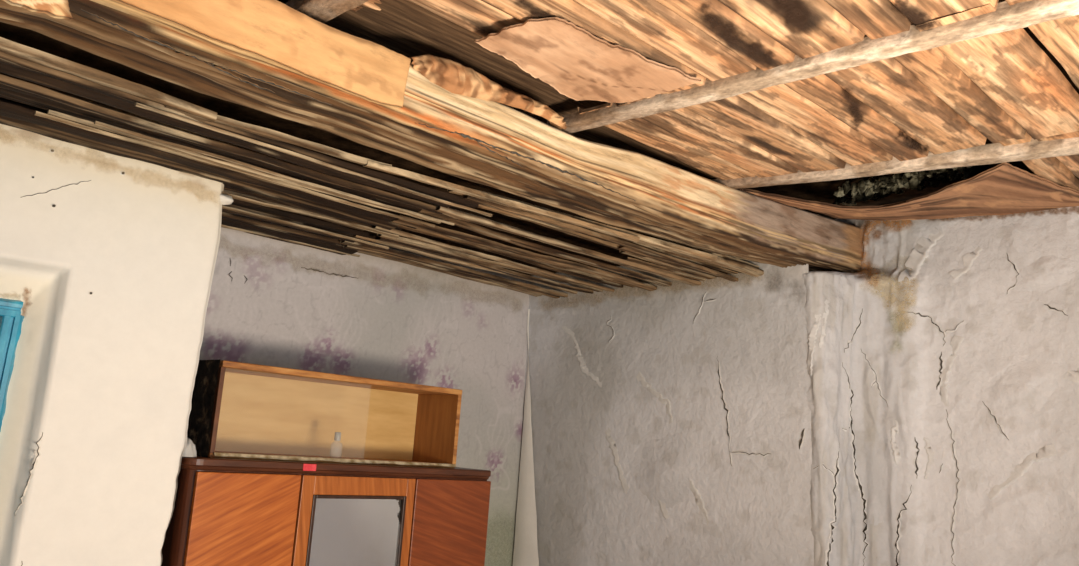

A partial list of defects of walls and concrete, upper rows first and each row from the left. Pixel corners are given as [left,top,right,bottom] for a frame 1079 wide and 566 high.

water stain [776,0,809,33]
crack [15,432,44,516]
crack [717,356,771,466]
crack [798,308,888,566]
crack [894,311,964,566]